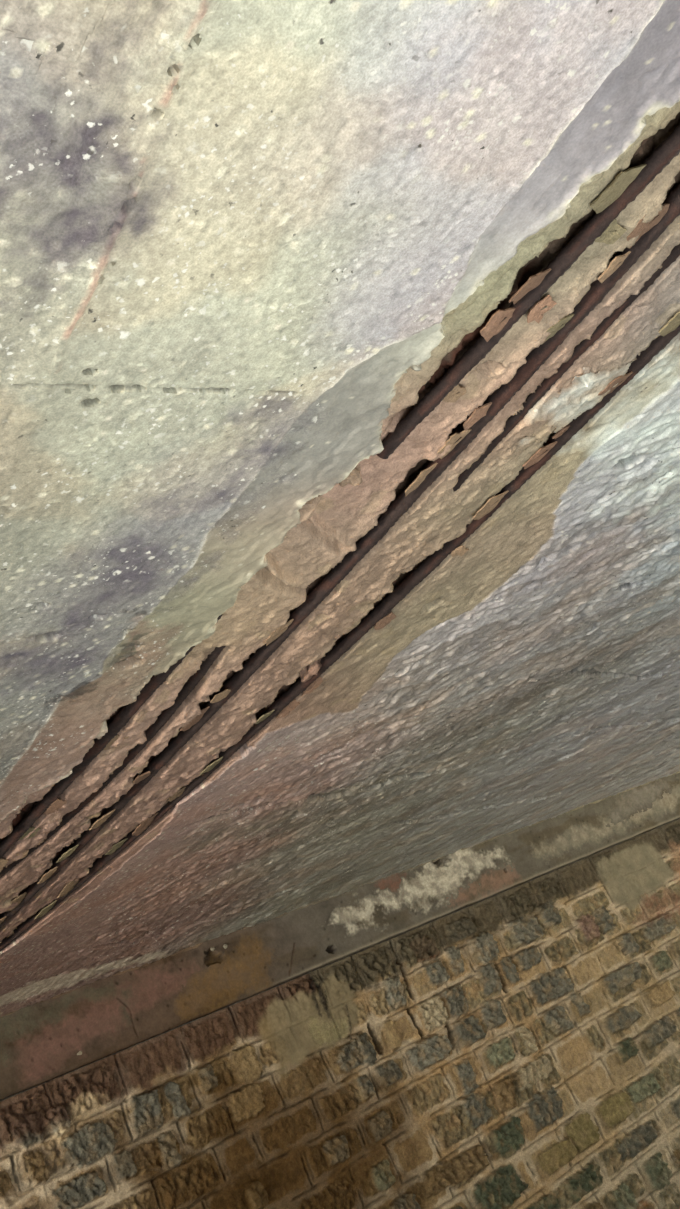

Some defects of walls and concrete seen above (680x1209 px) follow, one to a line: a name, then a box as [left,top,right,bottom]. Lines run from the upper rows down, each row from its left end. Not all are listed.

crack [159,25,202,113]
crack [0,262,300,395]
spalling [0,0,680,954]
leakage [526,774,680,865]
leakage [321,844,515,945]
leakage [0,943,178,1069]
leakage [307,973,359,1050]
leakage [43,1090,110,1151]
leakage [0,1172,37,1209]
leakage [176,1143,298,1209]